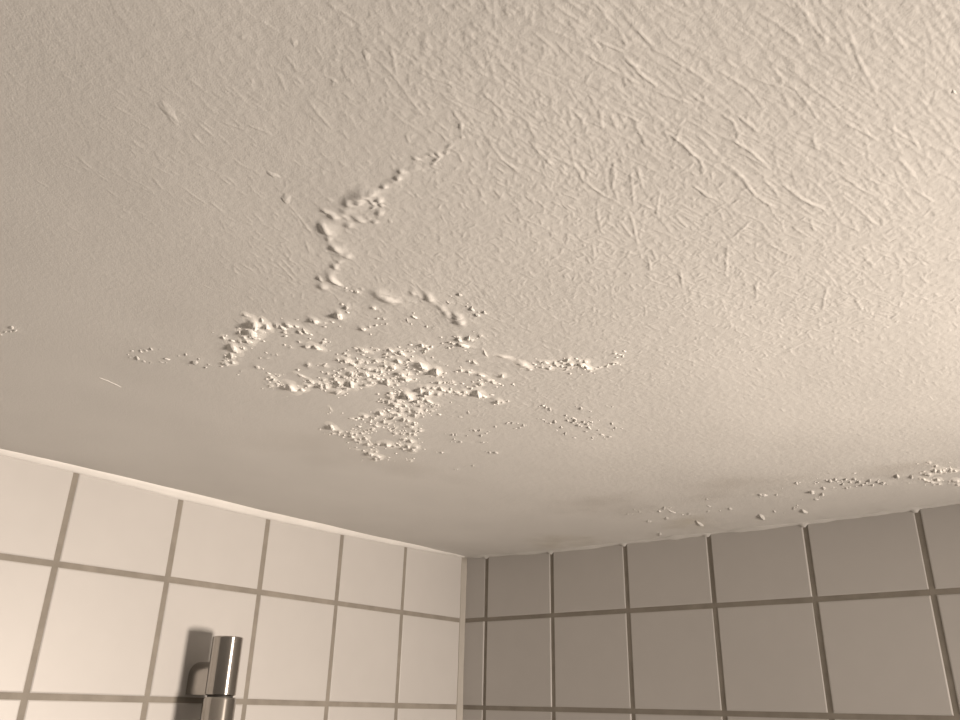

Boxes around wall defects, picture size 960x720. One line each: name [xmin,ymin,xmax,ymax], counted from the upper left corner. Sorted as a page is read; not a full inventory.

peeling [127,283,626,463]
peeling [896,460,960,487]